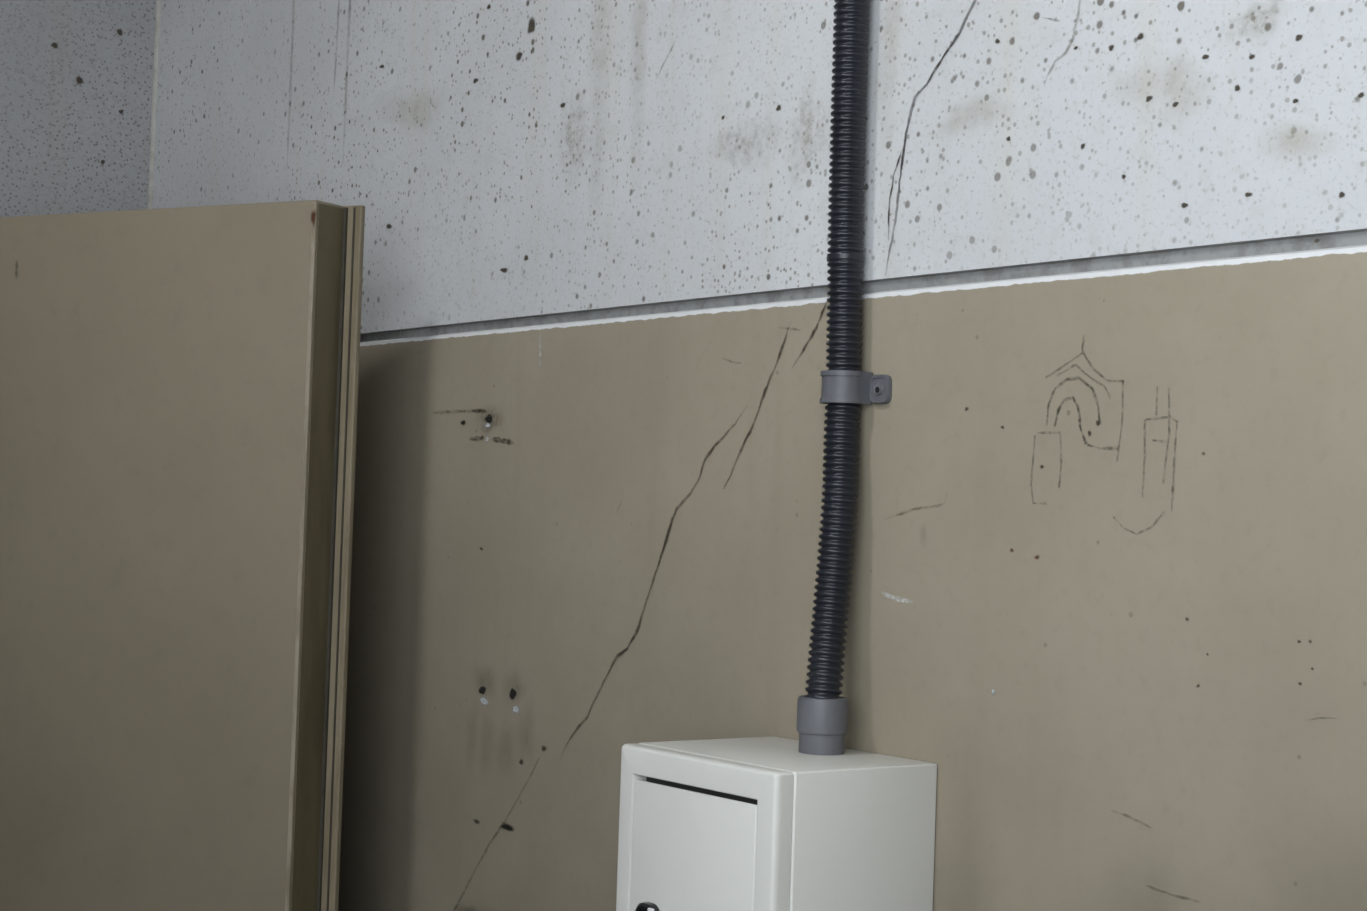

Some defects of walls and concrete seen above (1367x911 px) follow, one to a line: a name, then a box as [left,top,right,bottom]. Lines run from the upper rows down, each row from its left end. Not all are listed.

crack [886,0,975,269]
crack [652,306,825,583]
crack [606,617,642,677]